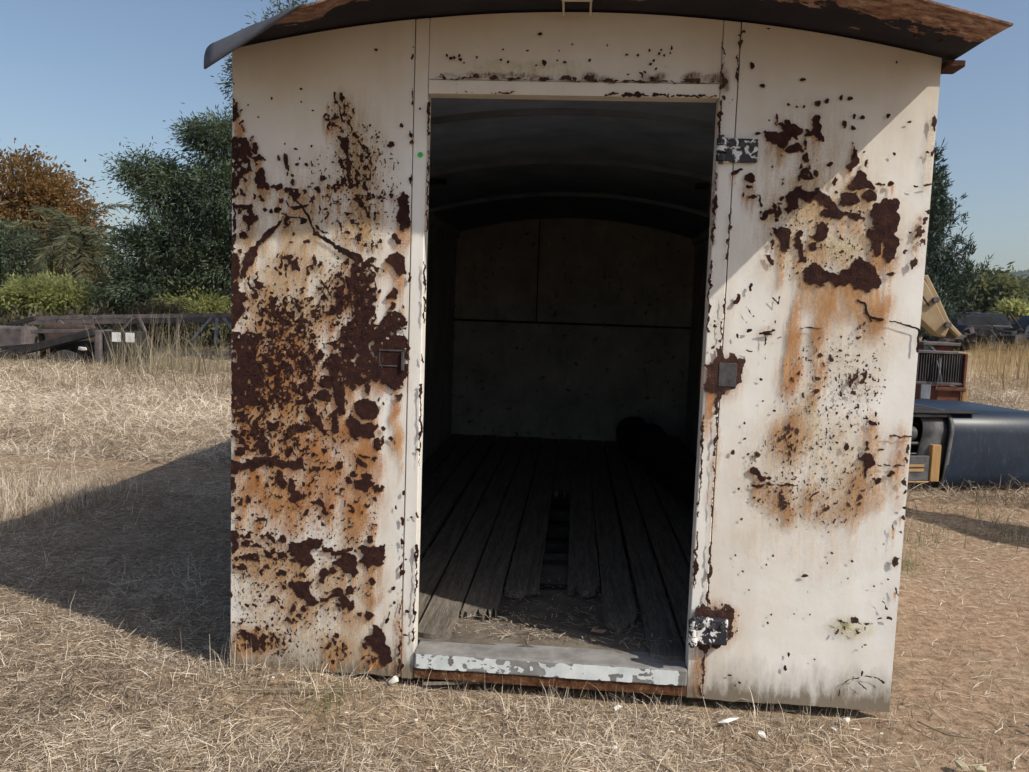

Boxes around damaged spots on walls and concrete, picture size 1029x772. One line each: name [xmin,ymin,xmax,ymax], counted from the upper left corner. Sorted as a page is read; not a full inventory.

rust [438,30,755,137]
rust [230,88,753,697]
rust [833,556,900,648]
peeling [416,654,680,686]